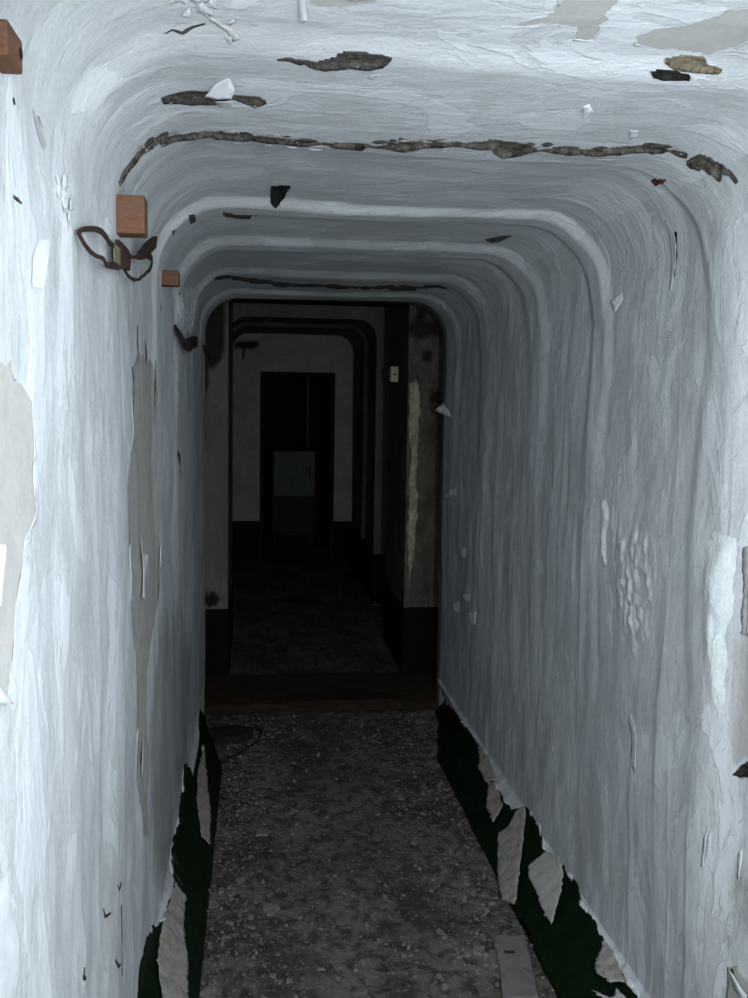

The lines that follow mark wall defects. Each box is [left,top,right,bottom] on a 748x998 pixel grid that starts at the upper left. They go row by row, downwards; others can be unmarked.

peeling [174,0,240,45]
spalling [162,78,267,108]
spalling [277,51,392,79]
peeling [431,0,619,42]
peeling [633,8,748,81]
crack [118,130,738,187]
peeling [0,359,37,705]
peeling [740,546,748,636]
peeling [137,709,217,998]
peeling [438,701,640,998]
peeling [726,966,748,998]